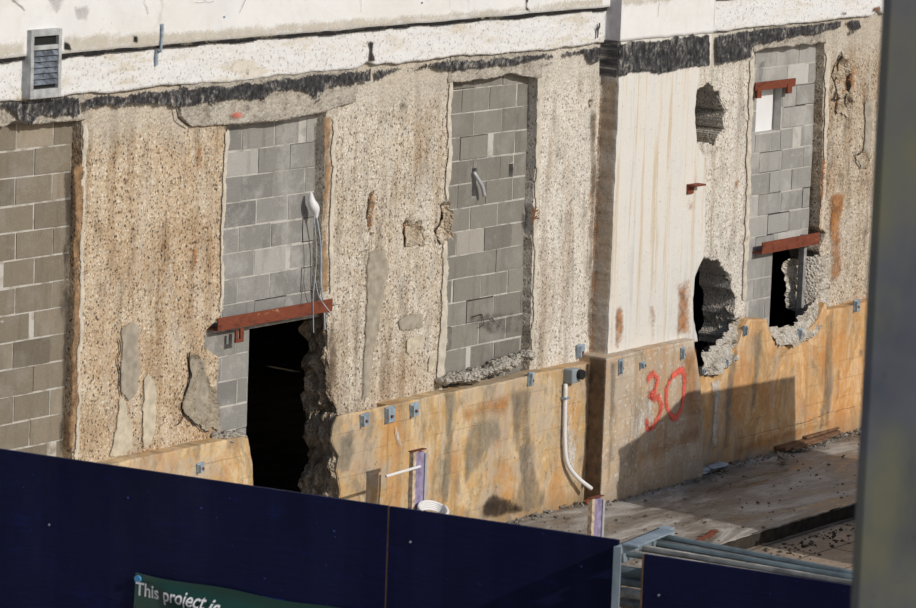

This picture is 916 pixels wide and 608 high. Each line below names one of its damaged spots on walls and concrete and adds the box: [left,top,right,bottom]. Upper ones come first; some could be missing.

peeling [0,41,553,125]
peeling [565,12,861,77]
spalling [831,54,855,117]
rust [819,159,843,278]
rust [679,284,689,332]
spalling [701,275,742,378]
spalling [298,313,341,498]